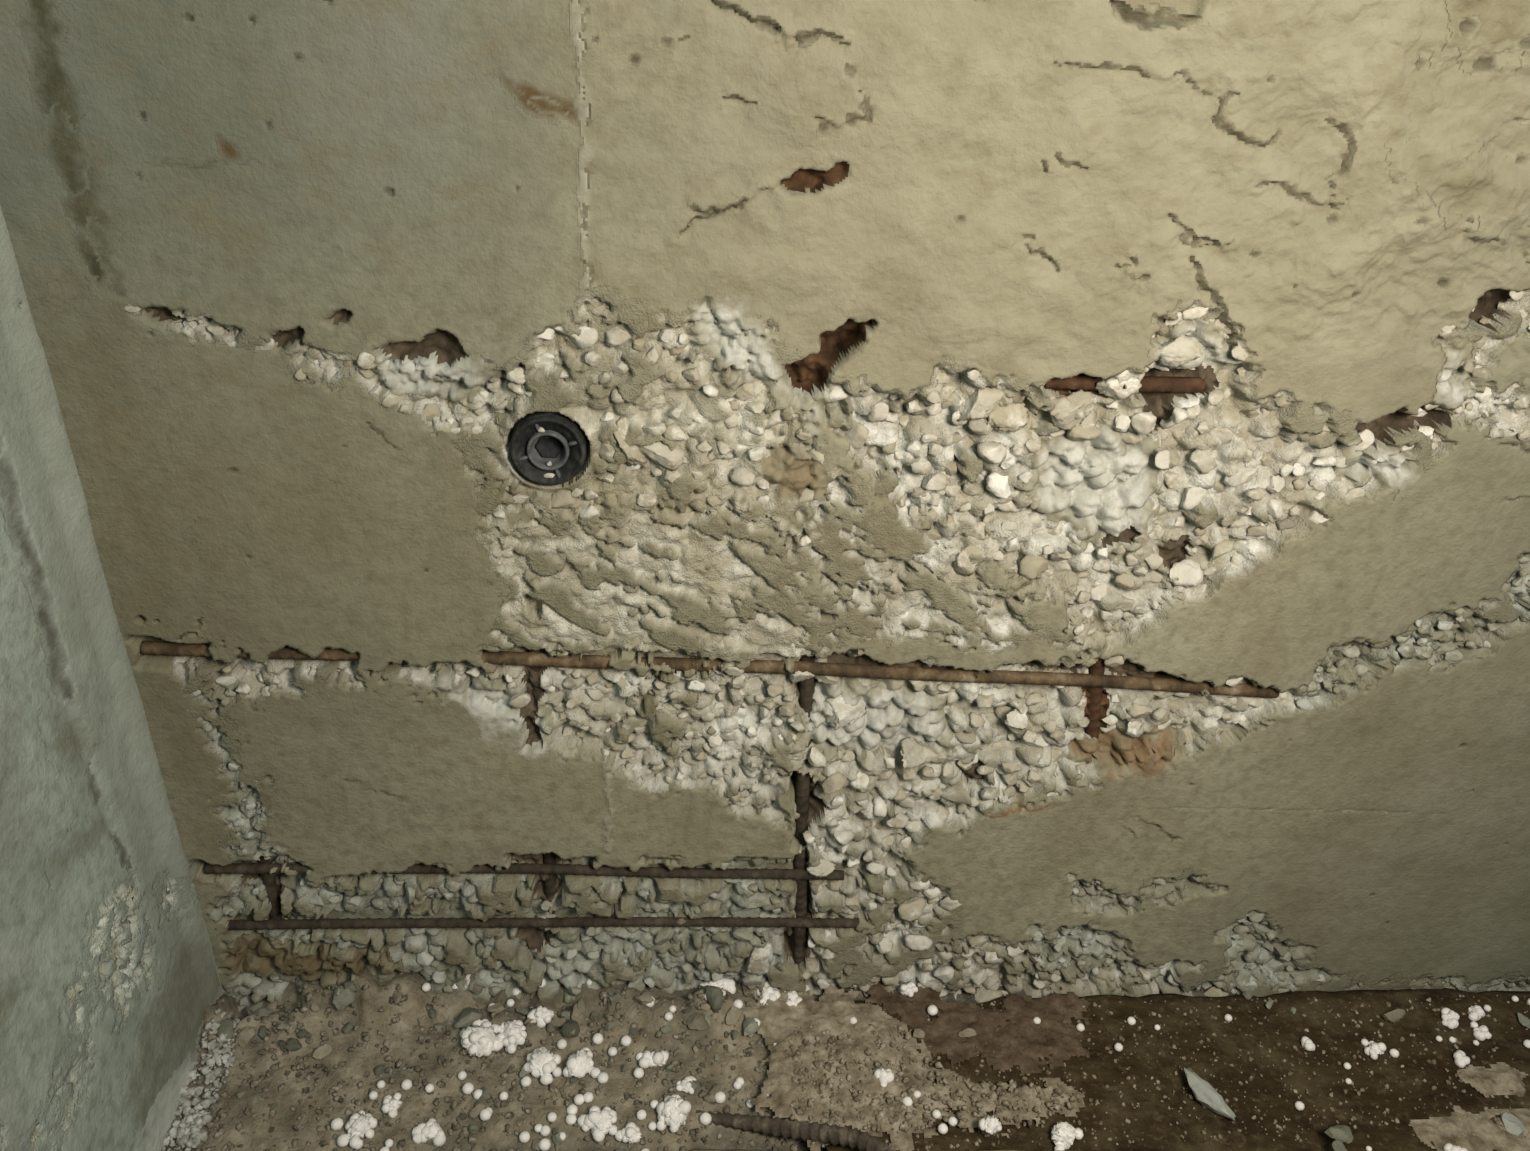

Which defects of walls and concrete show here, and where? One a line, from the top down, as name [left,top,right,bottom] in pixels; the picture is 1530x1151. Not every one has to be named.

crack [713,0,874,126]
crack [1054,61,1358,210]
spalling [124,306,241,337]
spalling [268,327,305,348]
crack [677,188,768,238]
crack [1023,234,1061,272]
crack [1168,213,1238,363]
spalling [1439,289,1530,373]
flaking render [357,302,824,521]
flaking render [505,306,1530,1003]
flaking render [222,791,524,996]
rust [212,929,406,988]